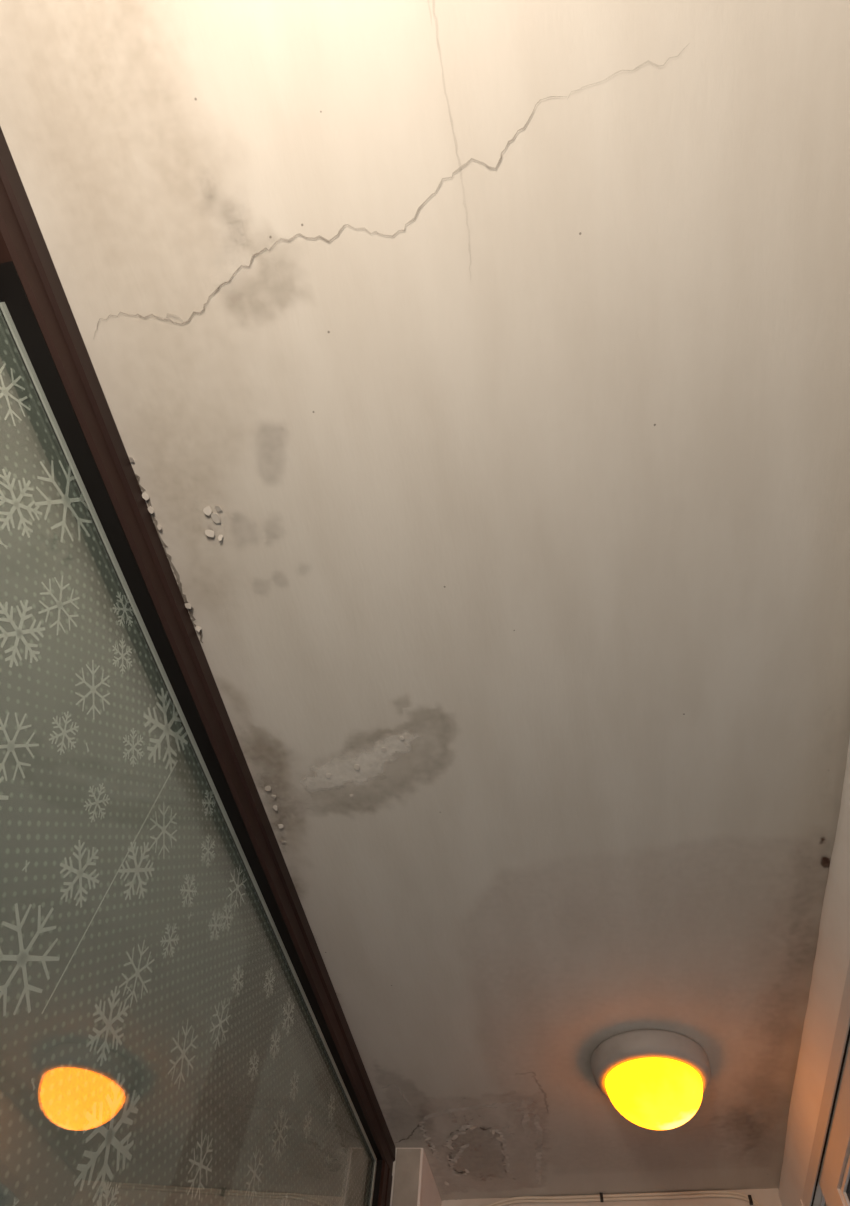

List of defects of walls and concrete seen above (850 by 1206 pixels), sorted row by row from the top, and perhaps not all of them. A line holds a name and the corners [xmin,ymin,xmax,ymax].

peeling [203,506,223,541]